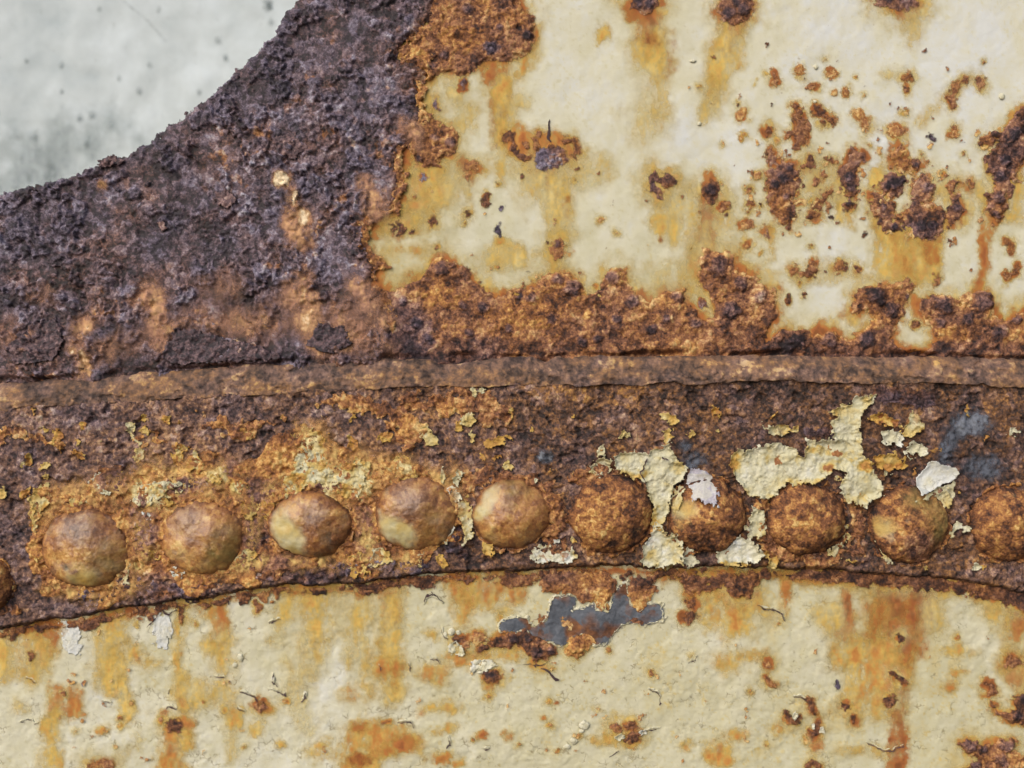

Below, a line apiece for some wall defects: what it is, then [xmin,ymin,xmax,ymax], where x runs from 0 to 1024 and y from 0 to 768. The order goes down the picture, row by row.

rust [0,0,1024,384]
peeling [31,407,87,460]
peeling [122,550,162,584]
rust [0,385,1024,768]
peeling [497,579,668,648]
peeling [589,413,720,571]
peeling [716,394,1000,569]